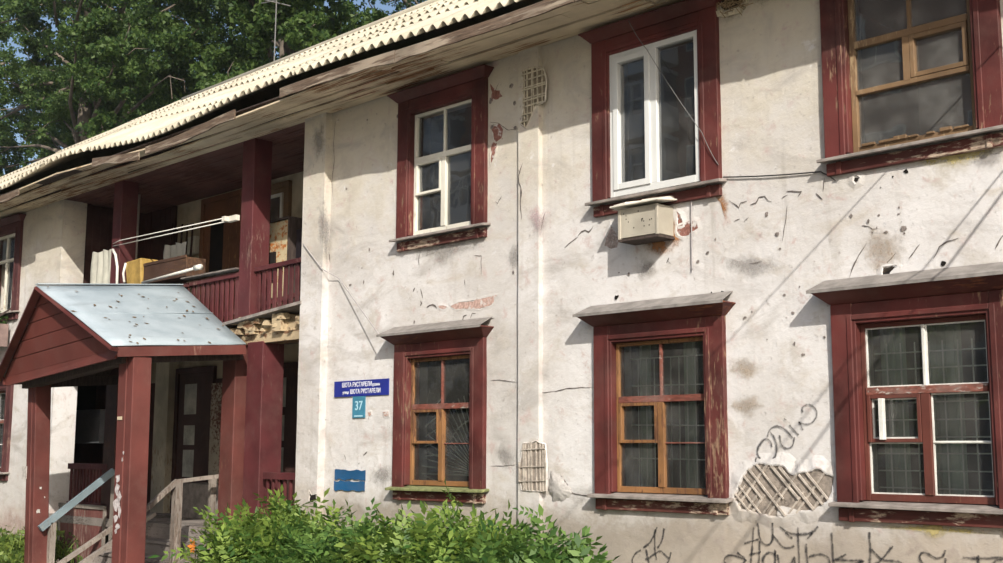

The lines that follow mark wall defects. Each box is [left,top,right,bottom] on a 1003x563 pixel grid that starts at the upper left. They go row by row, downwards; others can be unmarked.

spalling [716,0,753,18]
peeling [489,66,547,167]
crack [729,177,836,241]
peeling [437,293,499,312]
spalling [519,441,548,492]
spalling [729,452,837,528]